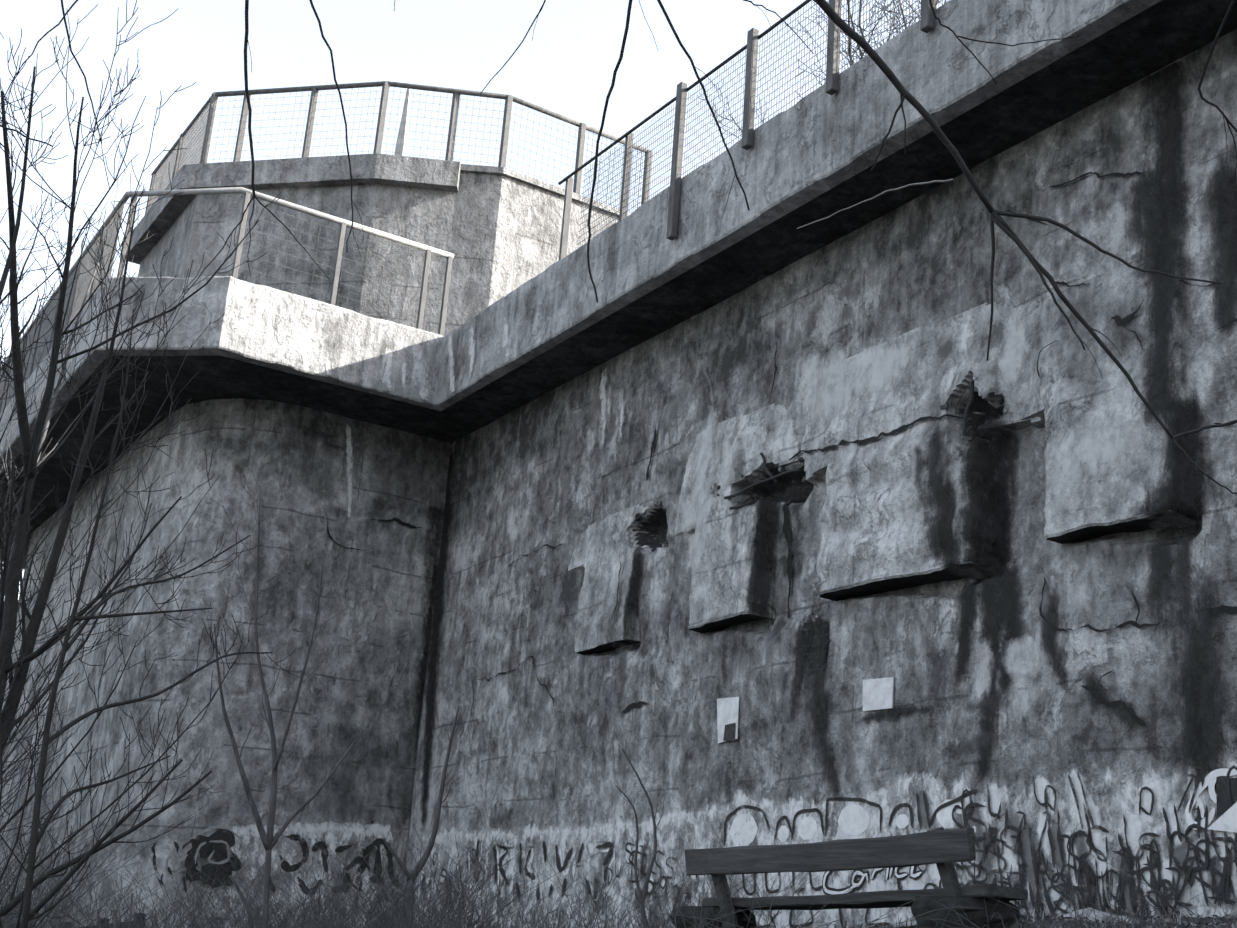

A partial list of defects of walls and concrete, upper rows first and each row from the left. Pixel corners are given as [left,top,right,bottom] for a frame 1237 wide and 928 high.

damp [1202,156,1237,340]
crack [789,414,964,470]
spalling [939,376,1008,452]
damp [1125,61,1225,781]
damp [415,450,454,826]
spalling [632,452,814,579]
damp [746,494,795,622]
damp [789,607,842,800]
damp [914,416,1065,779]
crack [1039,577,1162,632]
damp [1082,671,1134,728]